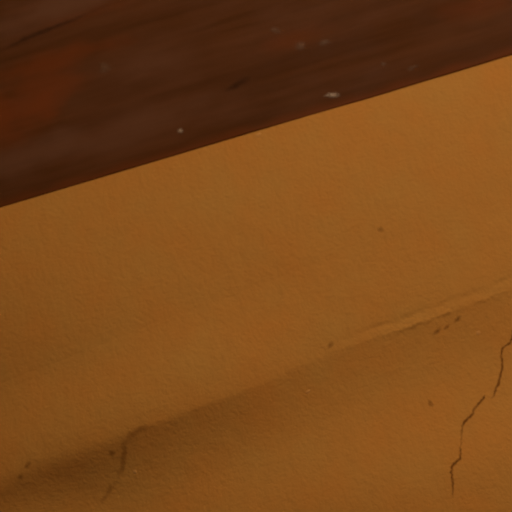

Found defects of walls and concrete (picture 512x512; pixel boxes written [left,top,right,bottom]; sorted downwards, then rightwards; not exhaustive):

crack [463,338,512,425]